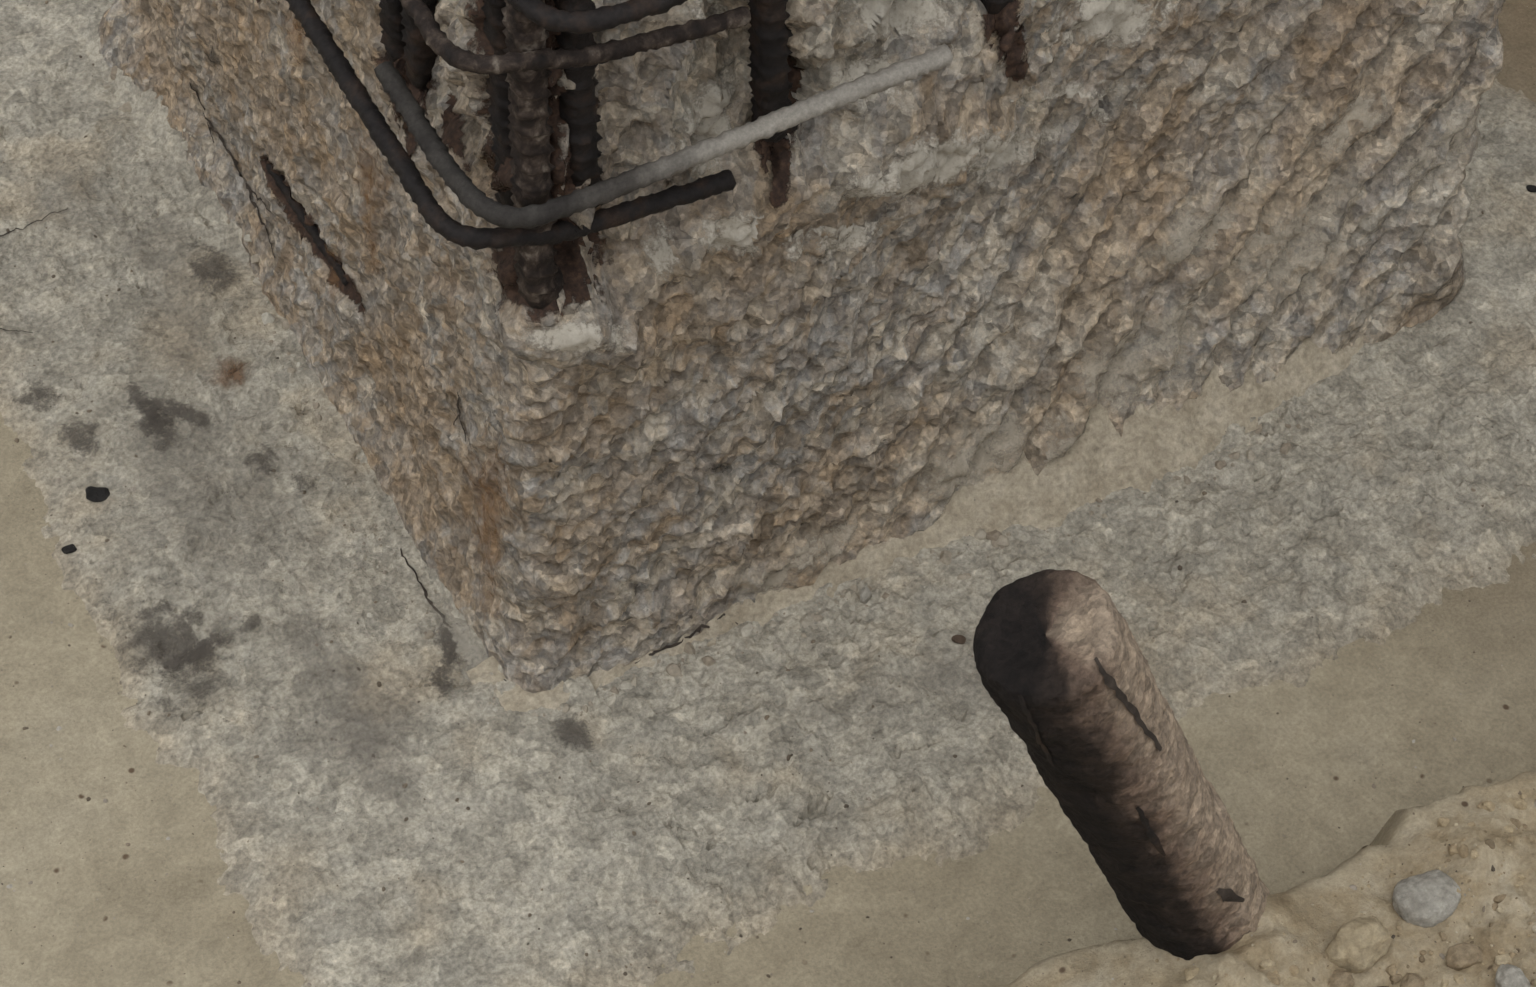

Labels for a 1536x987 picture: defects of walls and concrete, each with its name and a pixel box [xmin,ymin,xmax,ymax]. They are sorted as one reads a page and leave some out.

corrosion [787,55,804,104]
spalling [818,0,956,86]
corrosion [977,0,1030,82]
crack [189,82,275,258]
corrosion [753,124,802,208]
spalling [785,80,1147,261]
spalling [260,155,365,314]
spalling [486,217,629,354]
leakage [58,422,99,454]
leakage [128,382,209,450]
crack [400,548,458,629]
leakage [109,583,261,711]